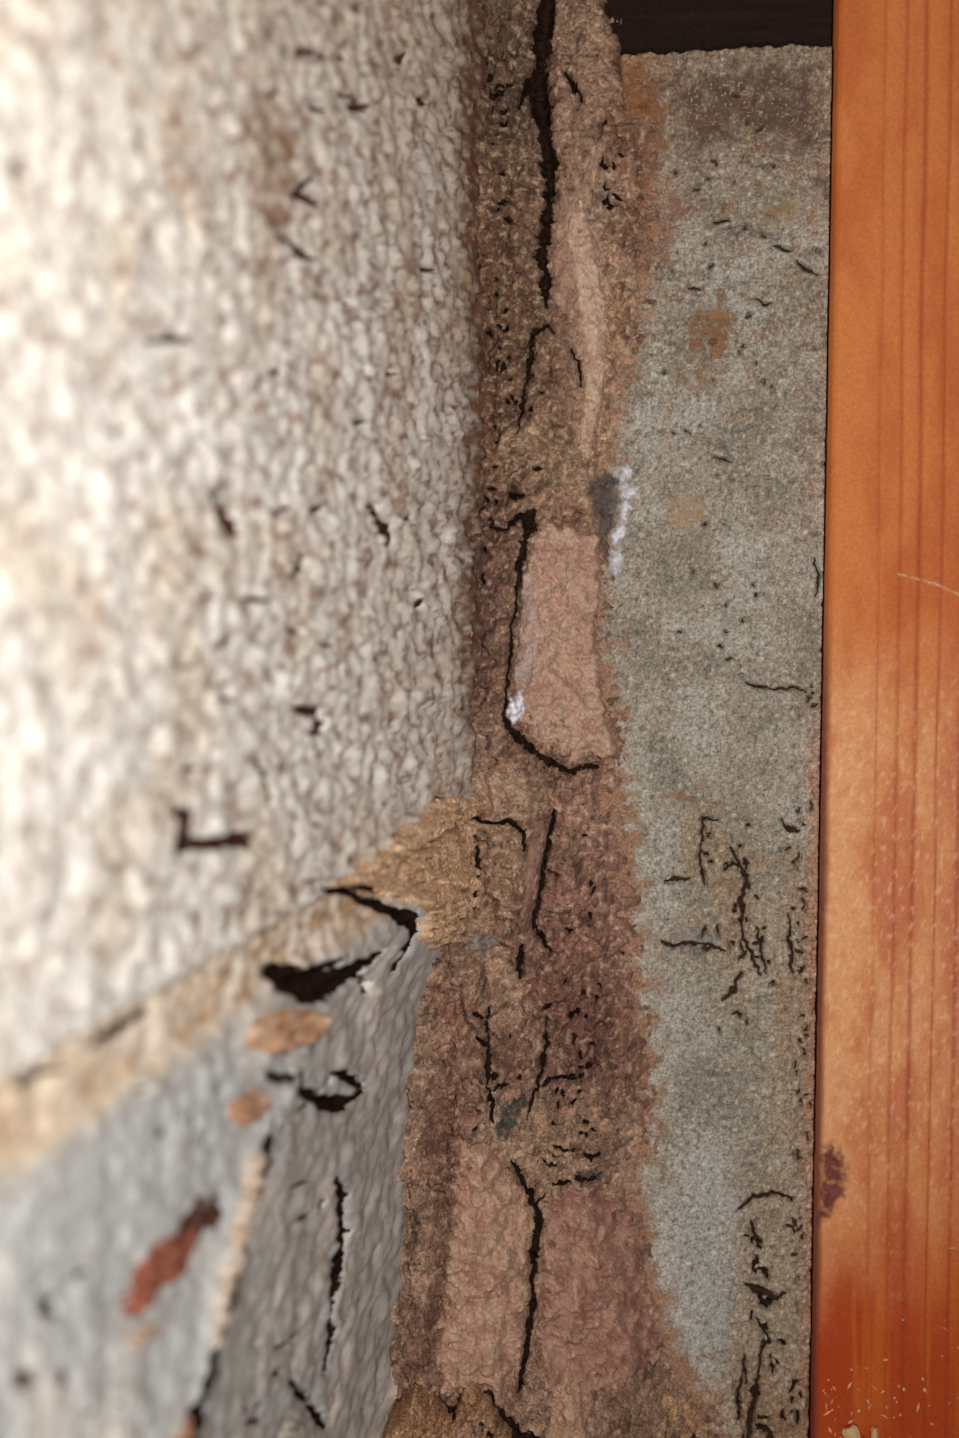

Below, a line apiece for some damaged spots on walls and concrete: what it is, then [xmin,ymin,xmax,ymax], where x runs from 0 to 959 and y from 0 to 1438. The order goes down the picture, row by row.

crack [516,0,583,434]
crack [490,492,599,776]
crack [321,884,420,971]
crack [472,810,556,979]
crack [661,816,767,1001]
spalling [214,951,382,1127]
spalling [11,1370,40,1390]
spalling [36,1295,58,1318]
peeling [118,1149,270,1350]
peeling [278,1404,308,1438]
crack [435,1159,546,1438]
spalling [547,1348,589,1438]